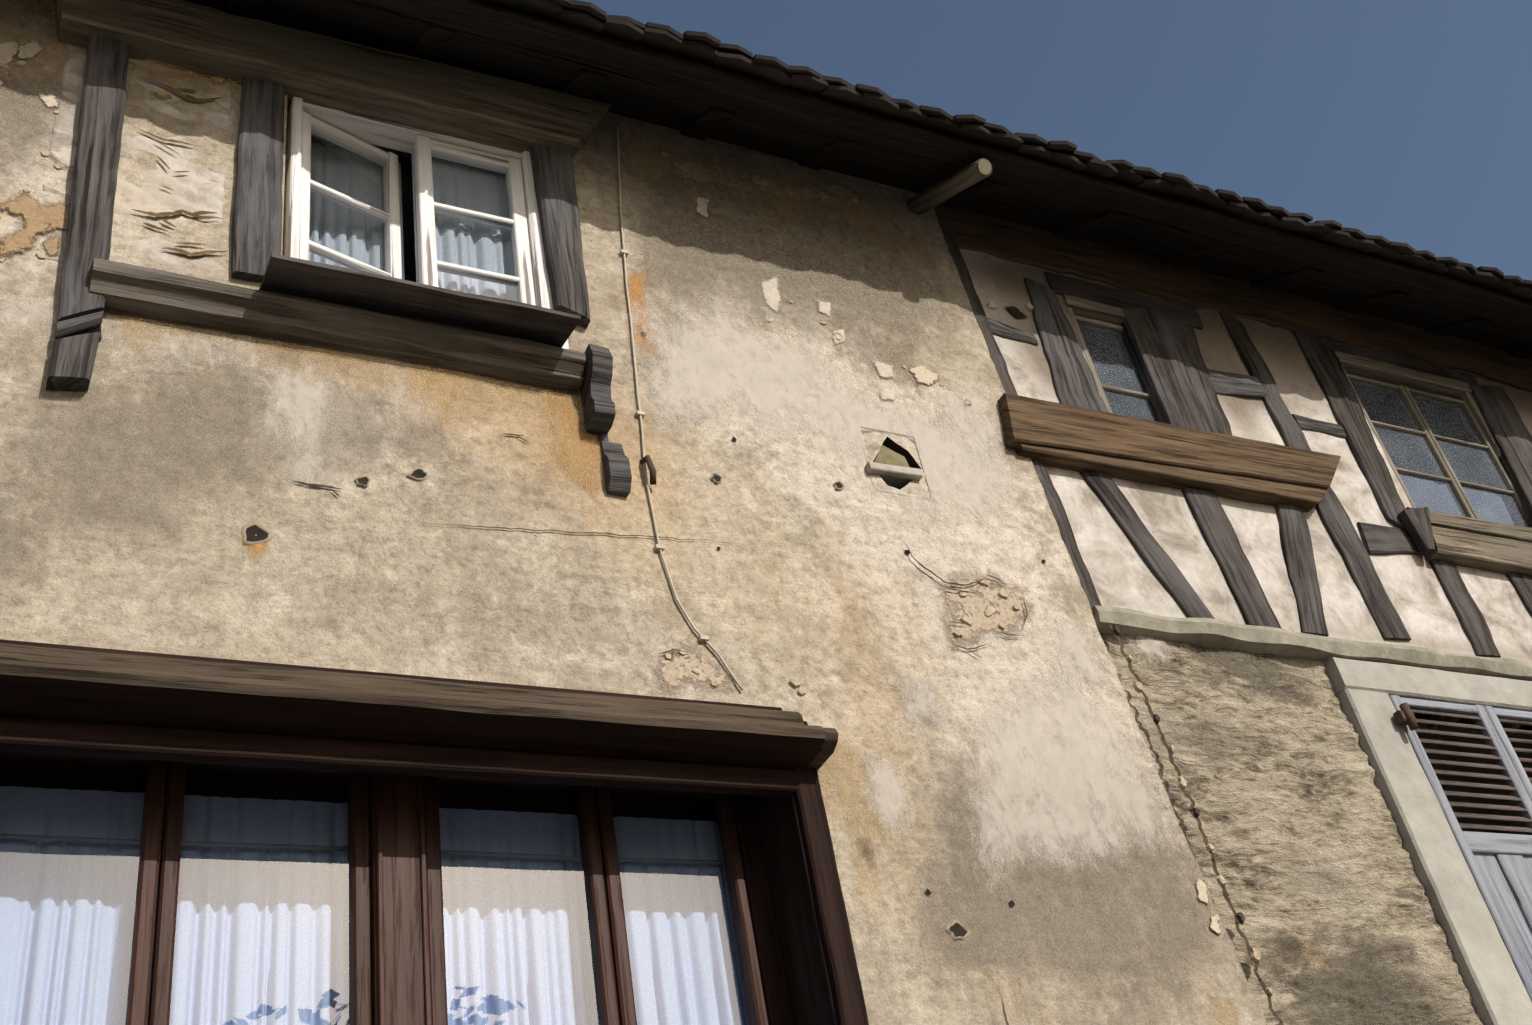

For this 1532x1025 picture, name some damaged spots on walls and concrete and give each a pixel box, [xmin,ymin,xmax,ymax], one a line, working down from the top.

peeling [0,39,43,86]
peeling [0,188,70,263]
peeling [696,197,710,217]
peeling [761,277,793,323]
peeling [817,300,845,344]
spalling [942,569,1033,648]
crack [1109,624,1284,1025]